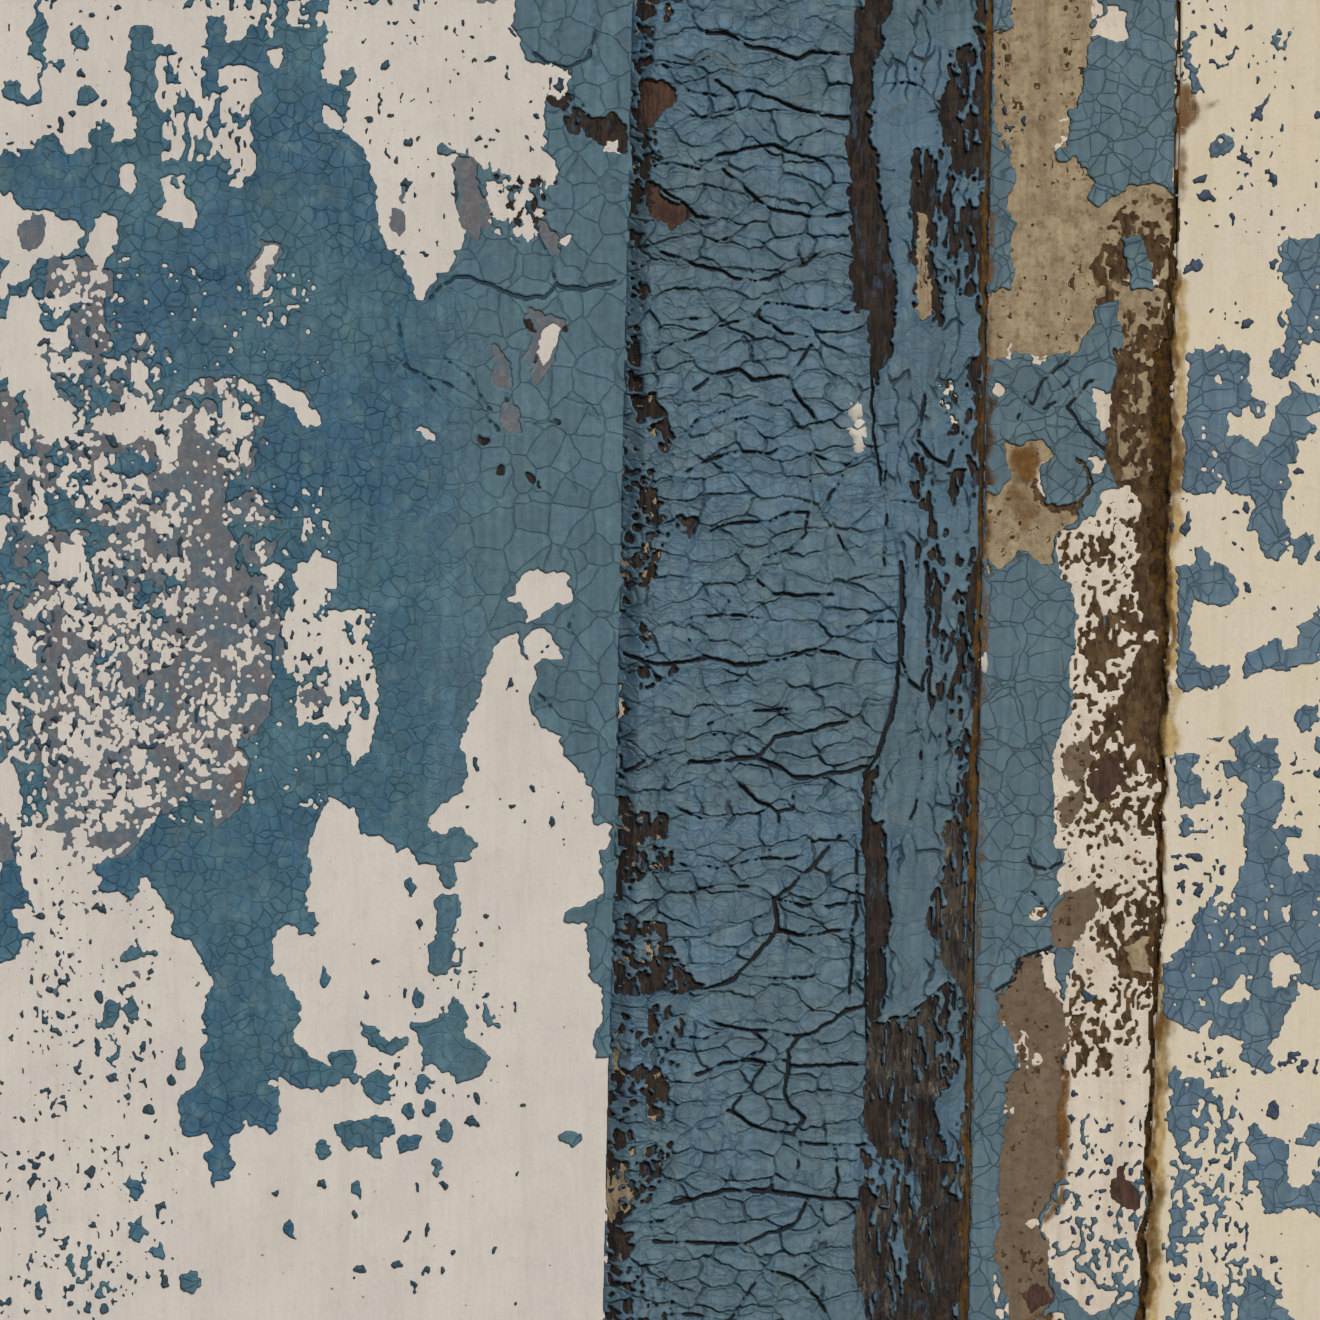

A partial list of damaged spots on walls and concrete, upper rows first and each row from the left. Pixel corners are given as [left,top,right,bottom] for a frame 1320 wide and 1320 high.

peeling [0,0,571,300]
peeling [603,140,621,154]
crack [646,28,858,472]
peeling [0,191,643,1320]
crack [619,368,942,1320]
peeling [946,0,1320,1320]
peeling [867,1196,896,1320]
peeling [868,1018,933,1175]
peeling [918,1174,948,1246]